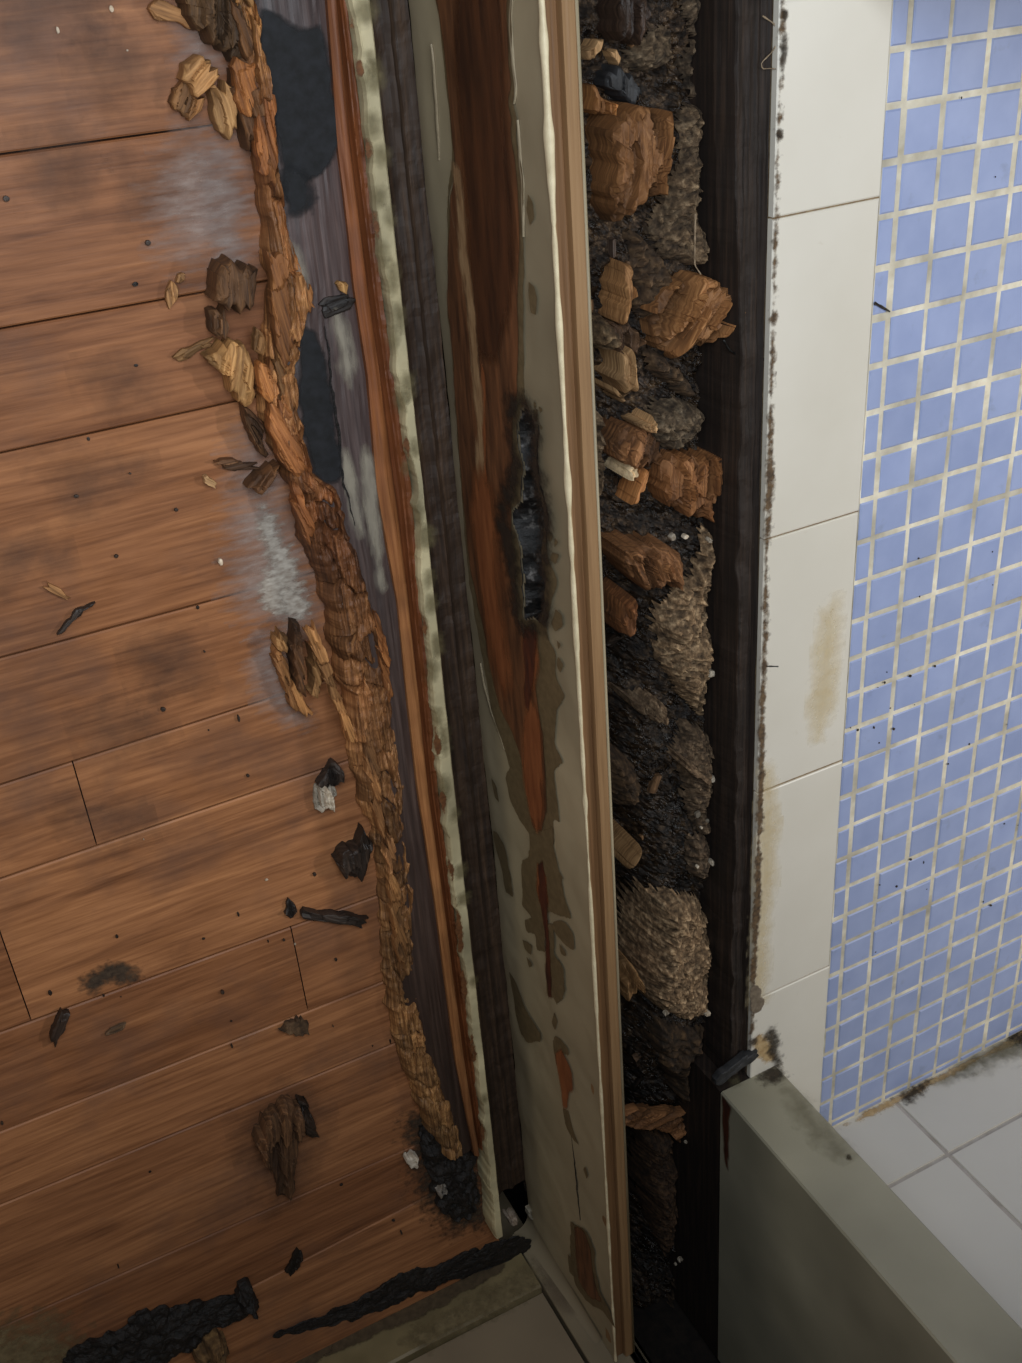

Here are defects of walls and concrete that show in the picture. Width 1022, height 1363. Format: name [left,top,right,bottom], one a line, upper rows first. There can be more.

peeling [430,0,578,1144]
peeling [315,758,345,788]
peeling [331,822,373,882]
peeling [284,898,297,918]
leakage [902,1080,929,1103]
leakage [398,1112,485,1235]
spalling [499,1191,523,1241]
peeling [568,1222,615,1327]